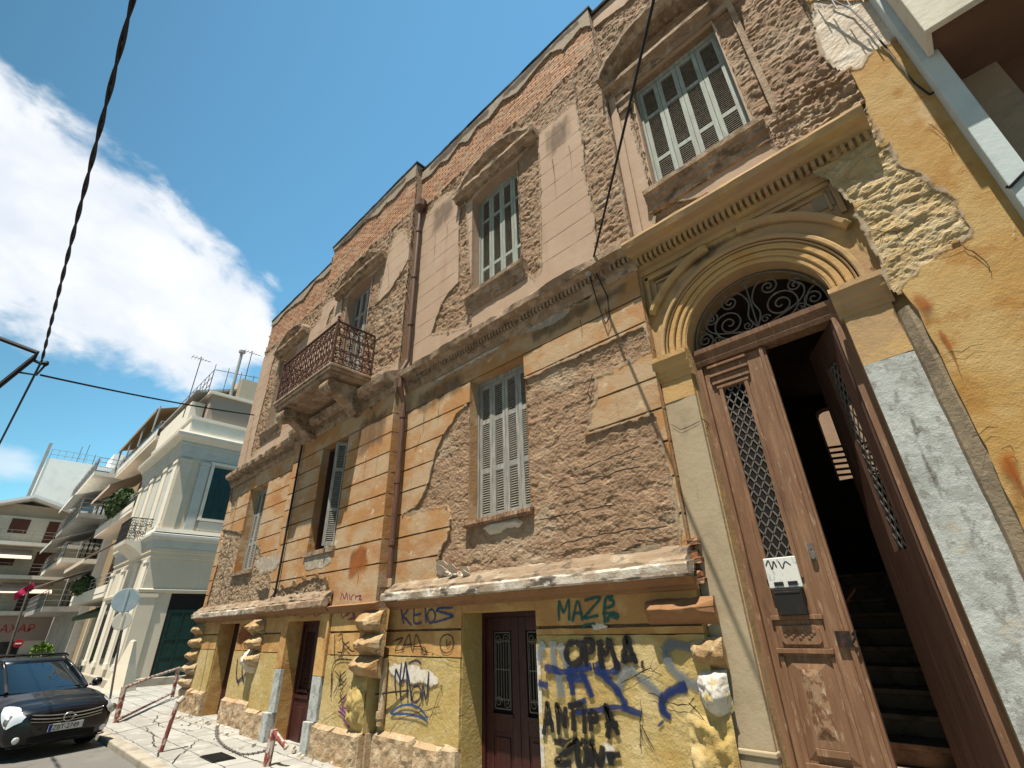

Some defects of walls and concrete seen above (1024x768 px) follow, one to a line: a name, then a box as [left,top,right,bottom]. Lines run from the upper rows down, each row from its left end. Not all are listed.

flaking render [712,0,973,295]
flaking render [250,0,652,457]
flaking render [653,192,706,225]
corrosion [939,331,960,372]
flaking render [401,326,707,583]
corrosion [1001,454,1024,495]
flaking render [205,528,333,607]
corrosion [349,547,366,583]